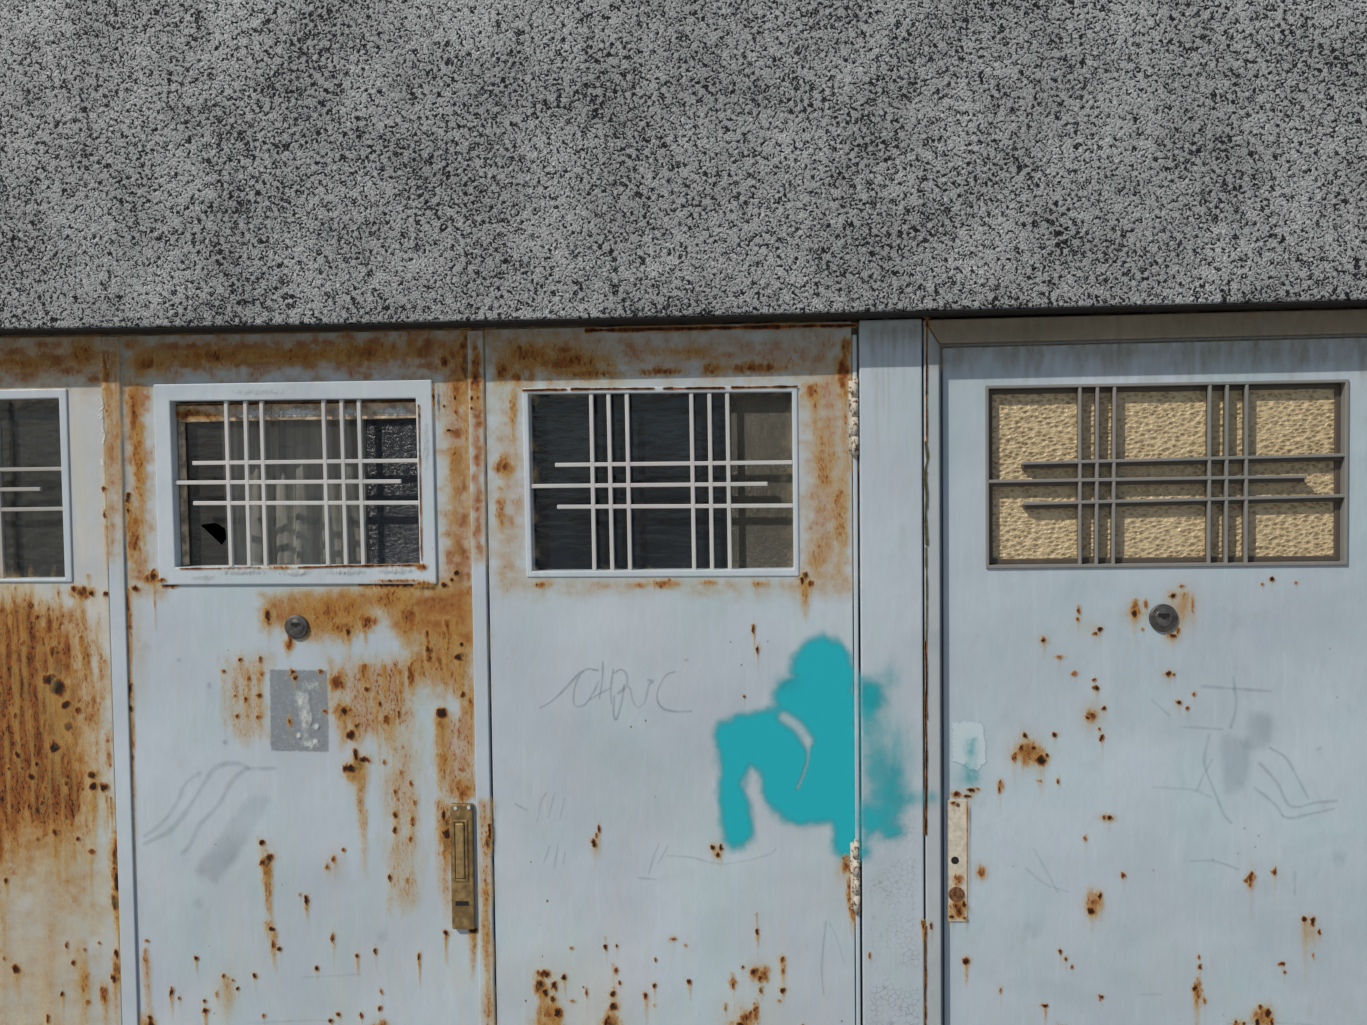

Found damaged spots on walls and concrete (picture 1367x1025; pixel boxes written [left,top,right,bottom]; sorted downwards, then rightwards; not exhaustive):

rust [1130,598,1148,631]
rust [1167,584,1194,638]
rust [0,323,857,1025]
rust [1071,671,1106,741]
rust [1011,732,1060,785]
rust [1243,866,1277,887]
rust [921,801,985,1025]
rust [1086,892,1102,915]
rust [1192,955,1207,1004]
rust [1233,1004,1274,1025]